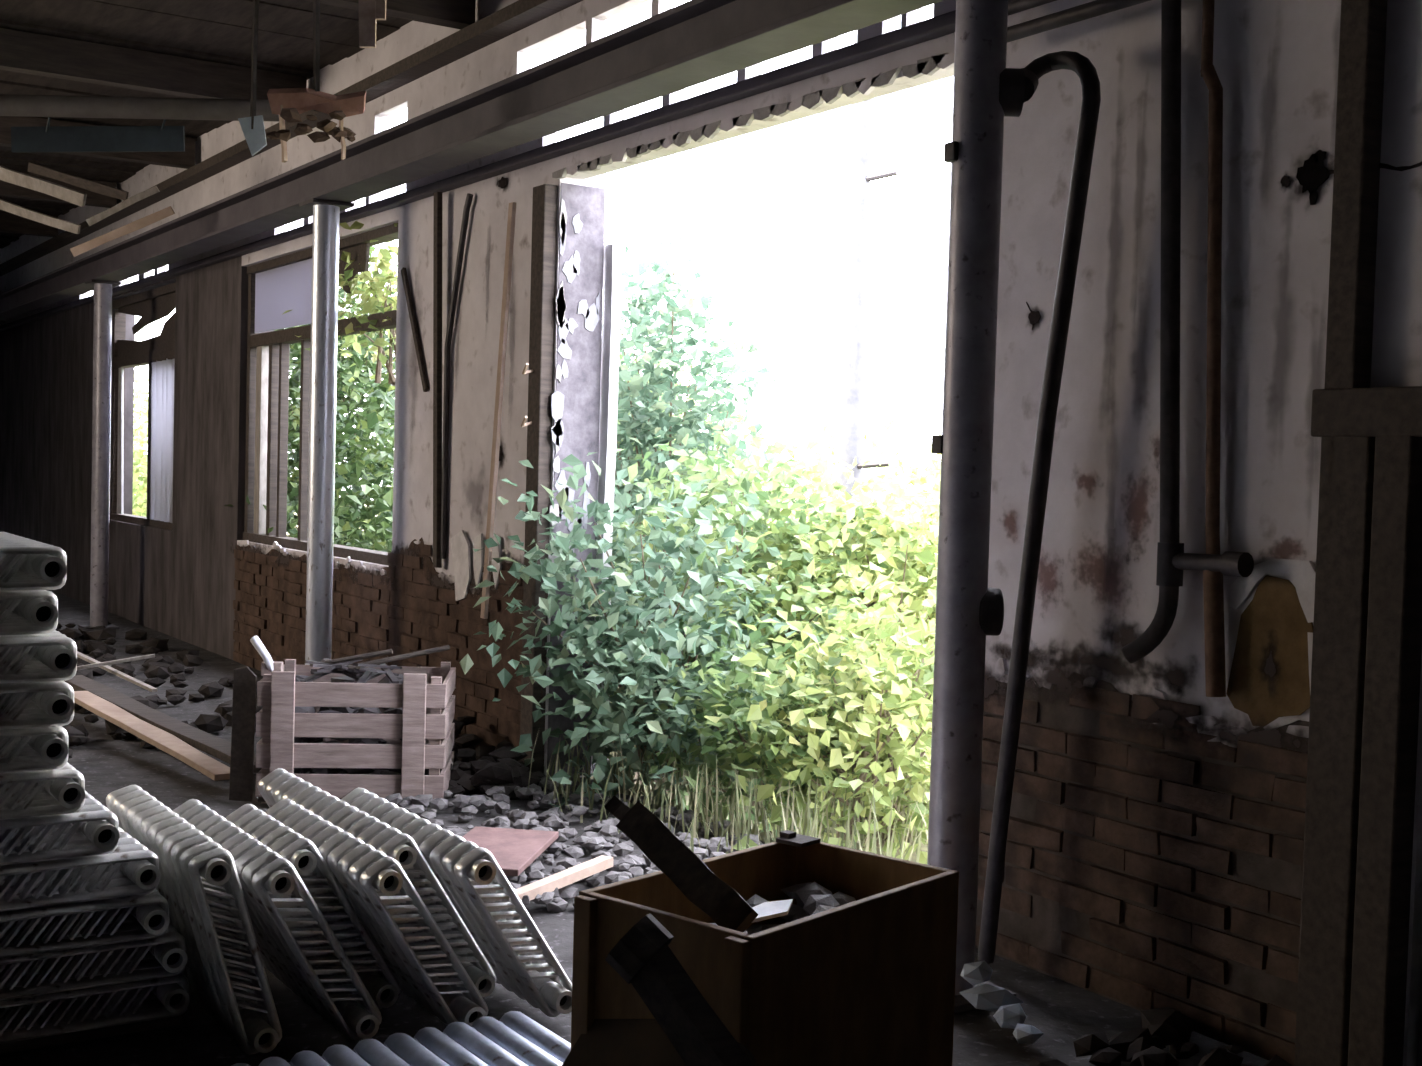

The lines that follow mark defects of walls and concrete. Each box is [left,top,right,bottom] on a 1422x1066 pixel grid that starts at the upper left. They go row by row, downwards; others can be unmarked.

crack [1379,161,1422,171]
peeling [548,198,600,565]
leakage [993,644,1012,660]
leakage [1027,623,1195,696]
flaking render [975,539,1316,1066]